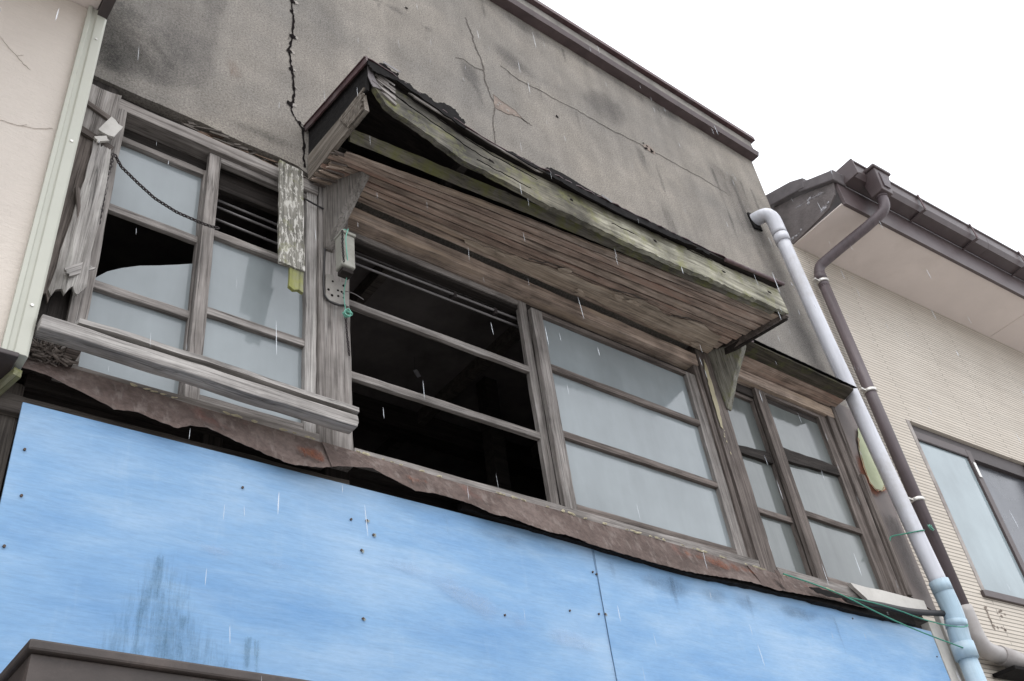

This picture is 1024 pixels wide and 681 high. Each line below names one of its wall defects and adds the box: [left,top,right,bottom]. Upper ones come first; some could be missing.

crack [286,0,308,168]
crack [455,19,726,193]